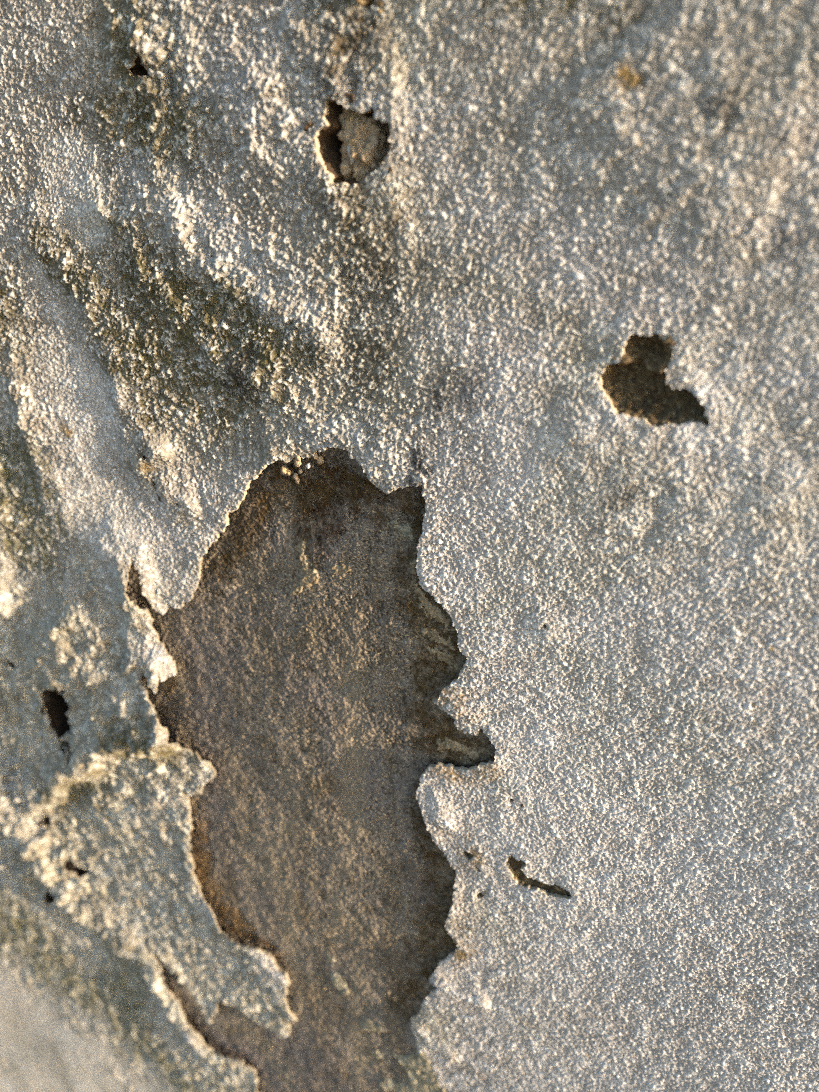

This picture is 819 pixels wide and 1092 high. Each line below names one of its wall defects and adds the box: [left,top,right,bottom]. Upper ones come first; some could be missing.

spalling [355,0,385,25]
spalling [303,92,393,194]
spalling [601,322,710,426]
peeling [125,446,496,1092]
spalling [503,855,571,896]